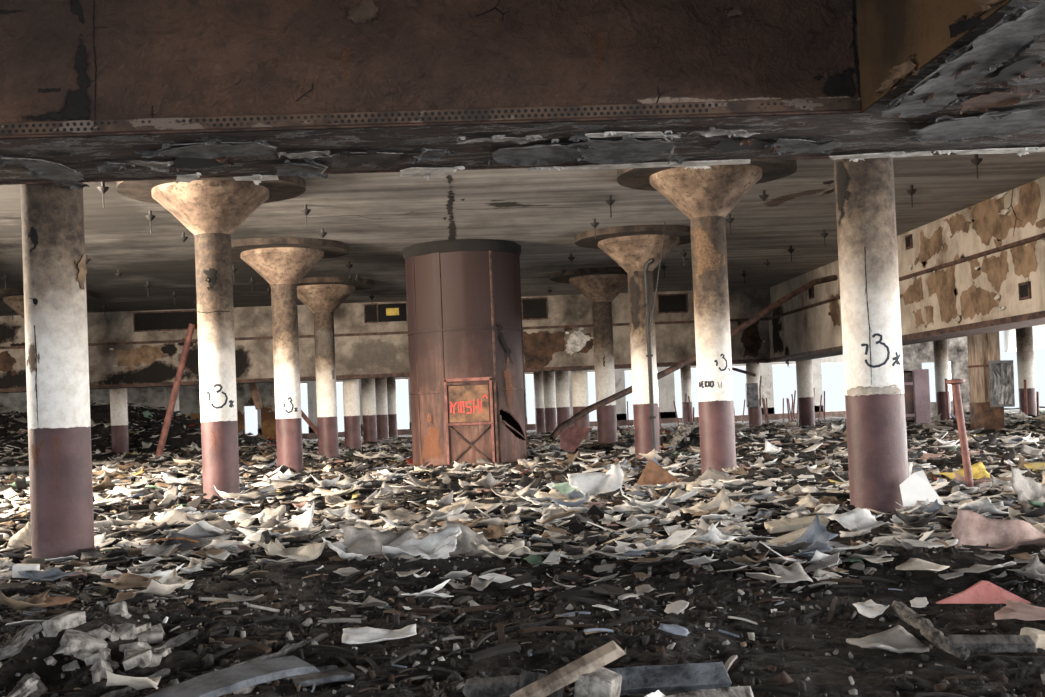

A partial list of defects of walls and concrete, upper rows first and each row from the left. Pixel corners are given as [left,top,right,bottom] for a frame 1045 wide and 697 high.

leakage [22,0,91,121]
peeling [95,0,1045,185]
peeling [0,155,89,190]
peeling [900,181,1045,329]
peeling [0,351,16,376]
peeling [523,327,594,373]